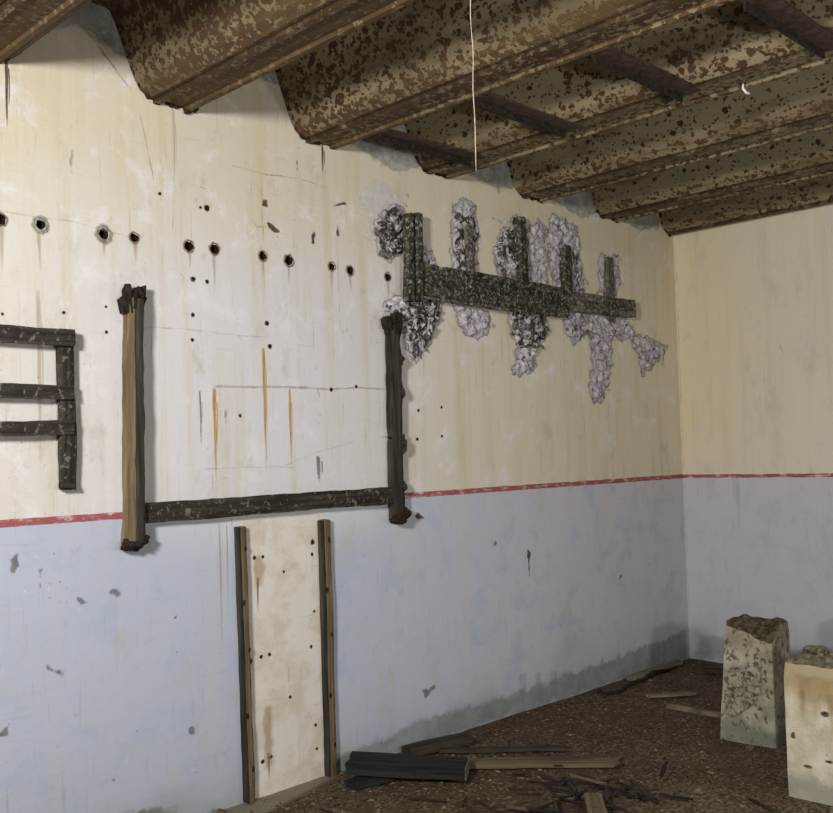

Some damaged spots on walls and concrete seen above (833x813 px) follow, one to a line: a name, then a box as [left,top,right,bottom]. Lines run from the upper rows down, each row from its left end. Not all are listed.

rust [133,70,199,114]
flaking render [423,242,438,266]
flaking render [449,197,480,270]
flaking render [527,190,596,293]
flaking render [596,253,623,296]
flaking render [452,303,493,339]
flaking render [587,314,669,404]
water stain [360,632,686,753]